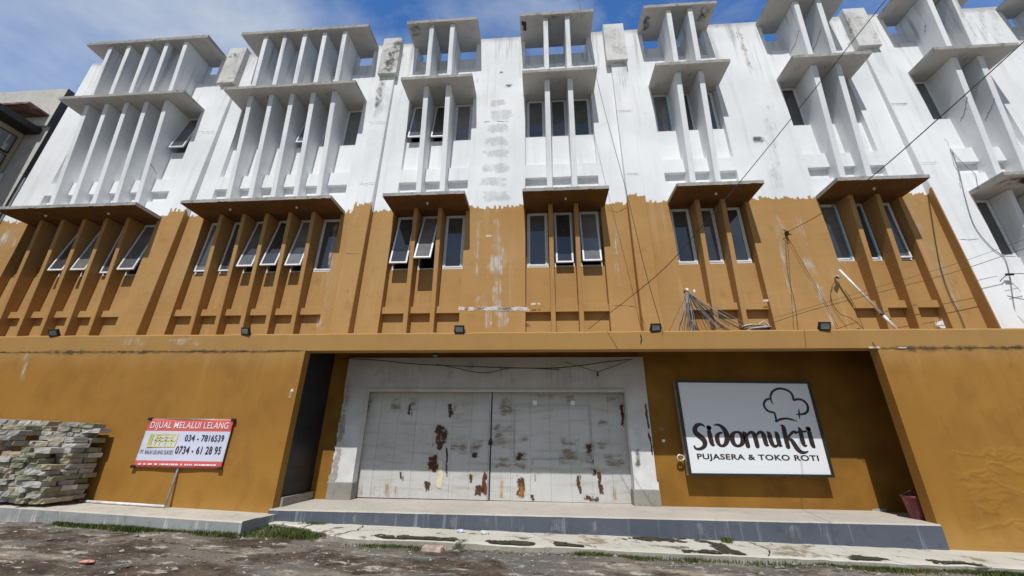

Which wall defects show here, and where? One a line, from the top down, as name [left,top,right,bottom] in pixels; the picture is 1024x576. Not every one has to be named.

spalling [327,378,351,483]
corrosion [469,472,487,495]
corrosion [516,477,535,500]
corrosion [562,442,624,501]